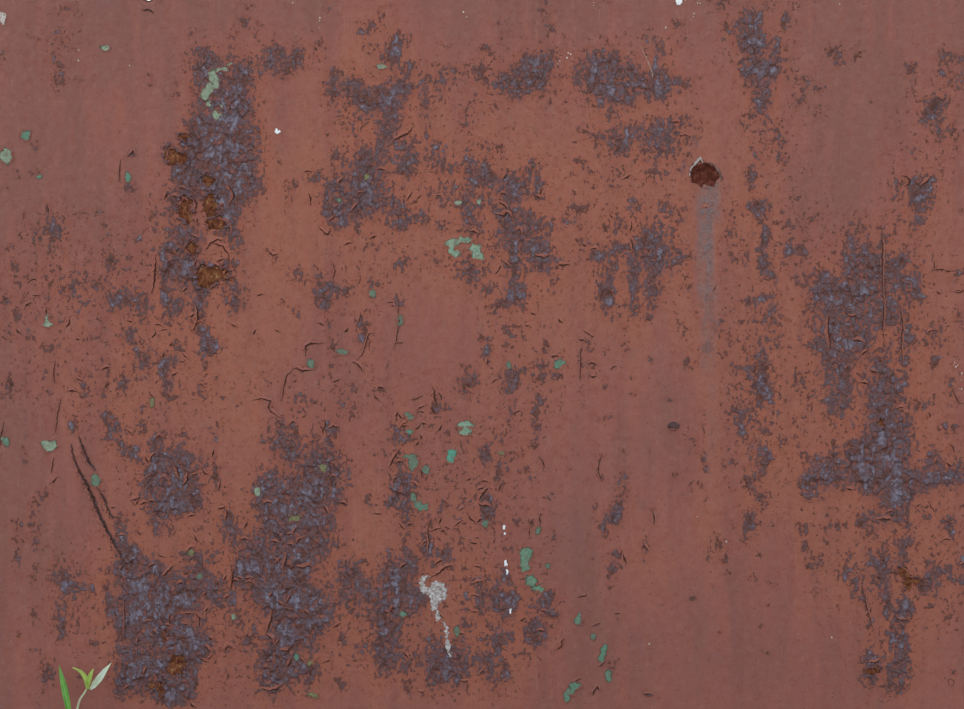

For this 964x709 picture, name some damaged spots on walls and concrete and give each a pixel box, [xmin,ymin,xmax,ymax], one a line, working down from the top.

peeling [199,61,234,122]
peeling [444,235,486,262]